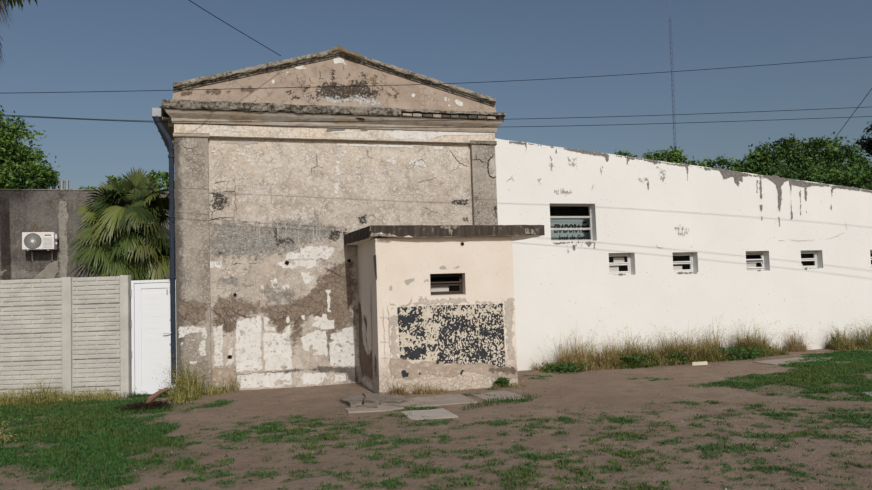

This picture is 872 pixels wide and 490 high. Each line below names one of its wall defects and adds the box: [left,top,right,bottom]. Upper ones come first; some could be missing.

water stain [209,190,229,210]
water stain [210,214,347,261]
peeling [276,245,334,284]
peeling [178,290,369,388]
peeling [389,296,515,378]